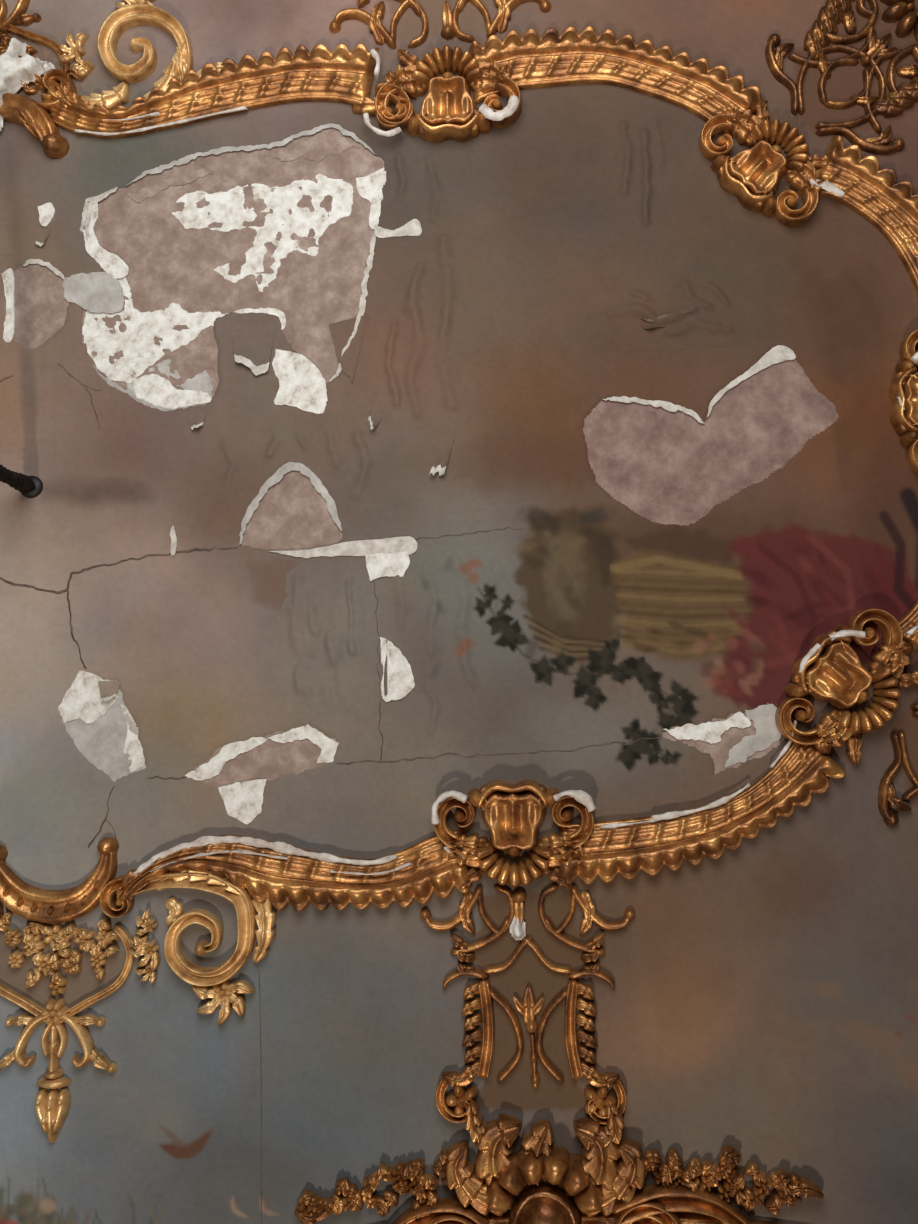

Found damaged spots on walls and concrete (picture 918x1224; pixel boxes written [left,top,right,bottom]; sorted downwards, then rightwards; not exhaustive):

flaking render [0,38,55,131]
flaking render [2,123,422,414]
flaking render [583,345,839,526]
crack [415,527,526,540]
crack [0,547,239,669]
flaking render [380,636,415,702]
crack [336,580,661,765]
flaking render [58,670,146,782]
crack [88,786,116,848]
crack [147,774,187,782]
flaking render [185,724,339,824]
flaking render [662,703,781,775]